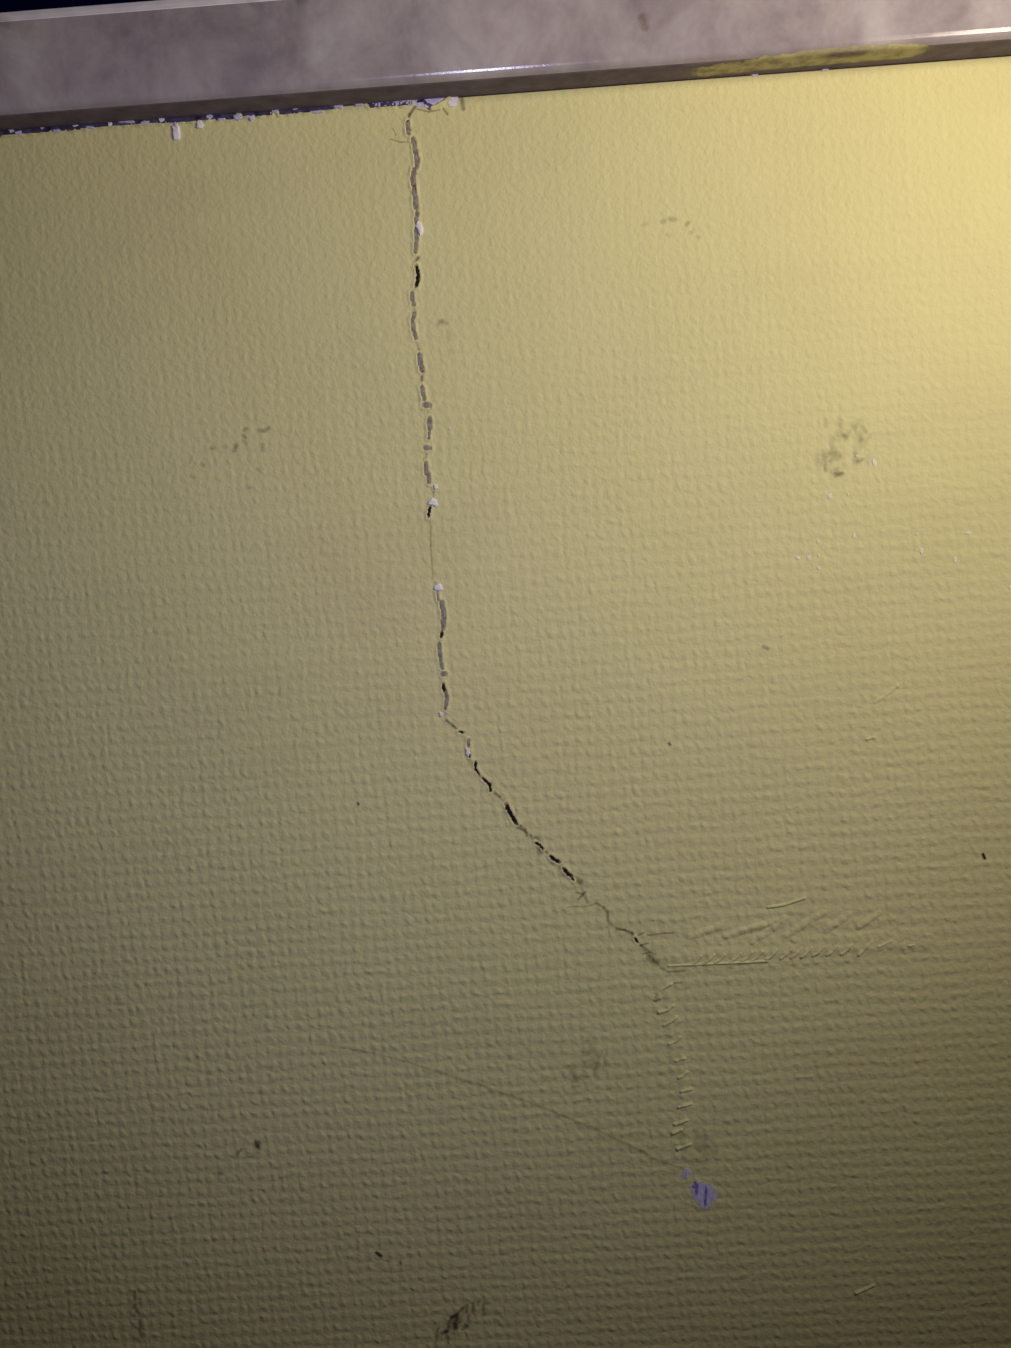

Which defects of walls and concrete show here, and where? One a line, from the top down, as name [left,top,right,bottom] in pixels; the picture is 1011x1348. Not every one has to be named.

crack [0,100,438,522]
crack [432,583,643,947]